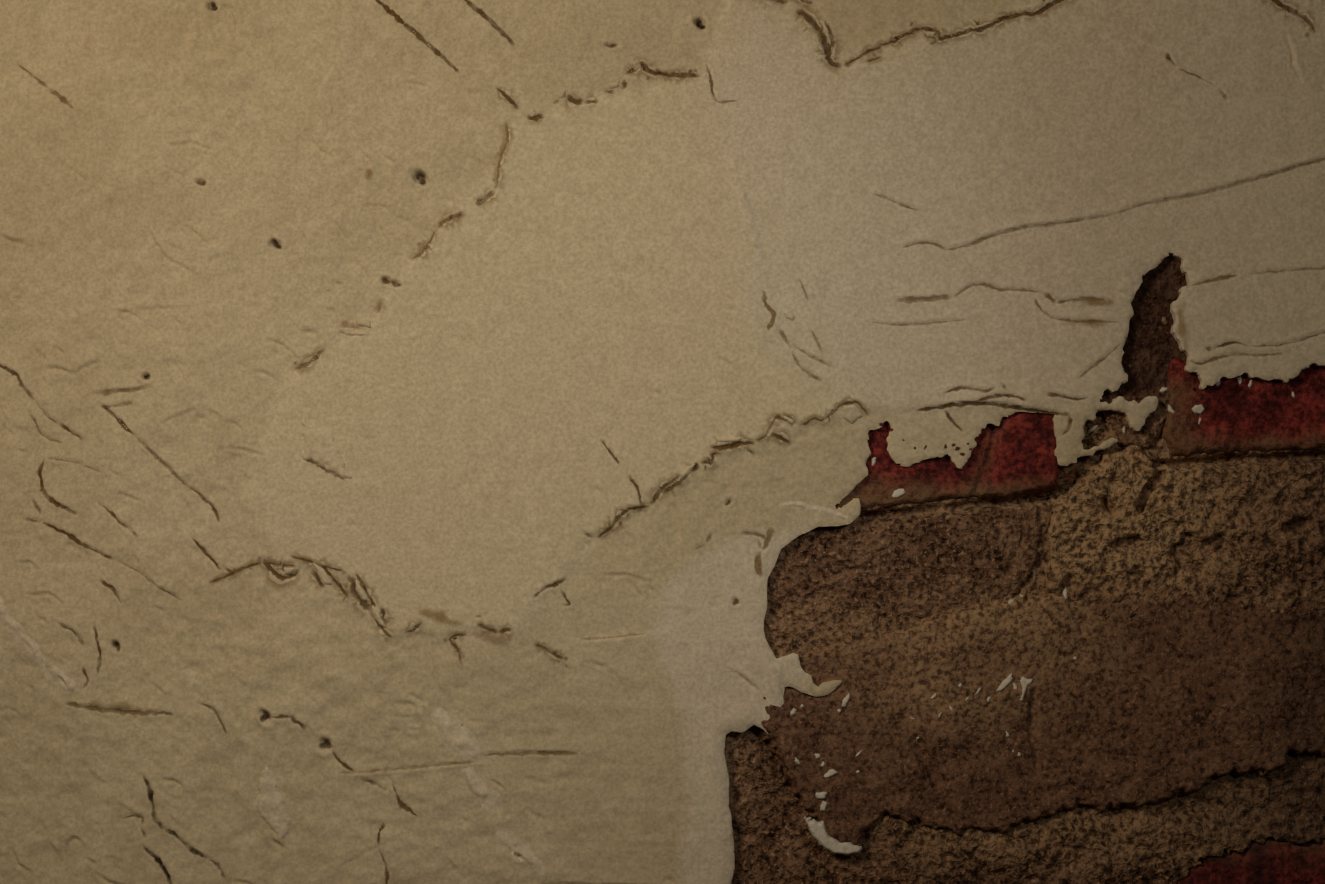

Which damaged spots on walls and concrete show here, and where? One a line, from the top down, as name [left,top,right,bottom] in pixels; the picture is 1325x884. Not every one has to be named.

crack [777,0,1063,67]
crack [1272,0,1314,29]
crack [415,58,731,258]
crack [301,317,371,367]
crack [1207,341,1277,349]
crack [104,407,152,453]
crack [587,397,866,536]
crack [194,491,419,636]
crack [535,580,570,605]
spalling [725,254,1325,884]
crack [449,624,561,657]